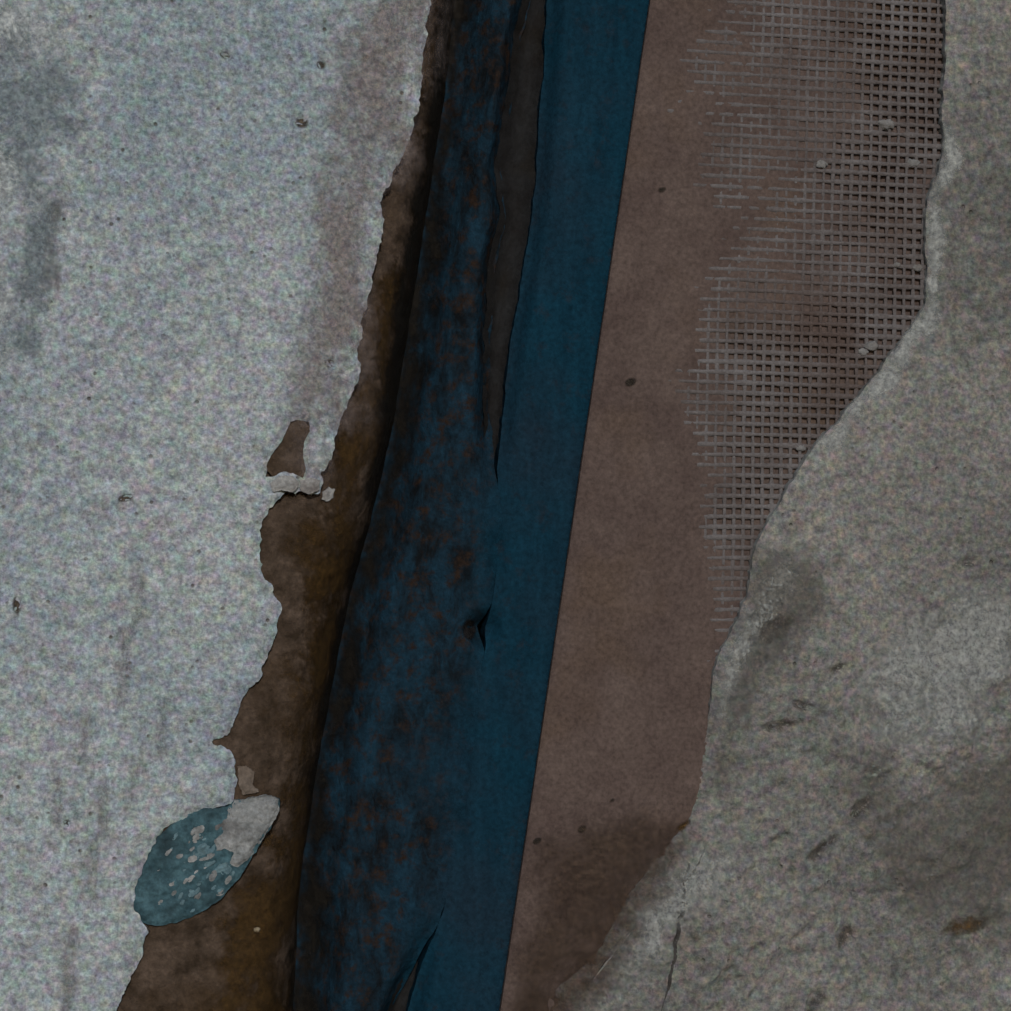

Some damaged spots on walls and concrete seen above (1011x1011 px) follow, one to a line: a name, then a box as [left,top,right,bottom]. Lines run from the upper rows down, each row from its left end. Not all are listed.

spalling [117,0,451,1011]
crack [661,846,705,1011]
peeling [499,0,962,1011]